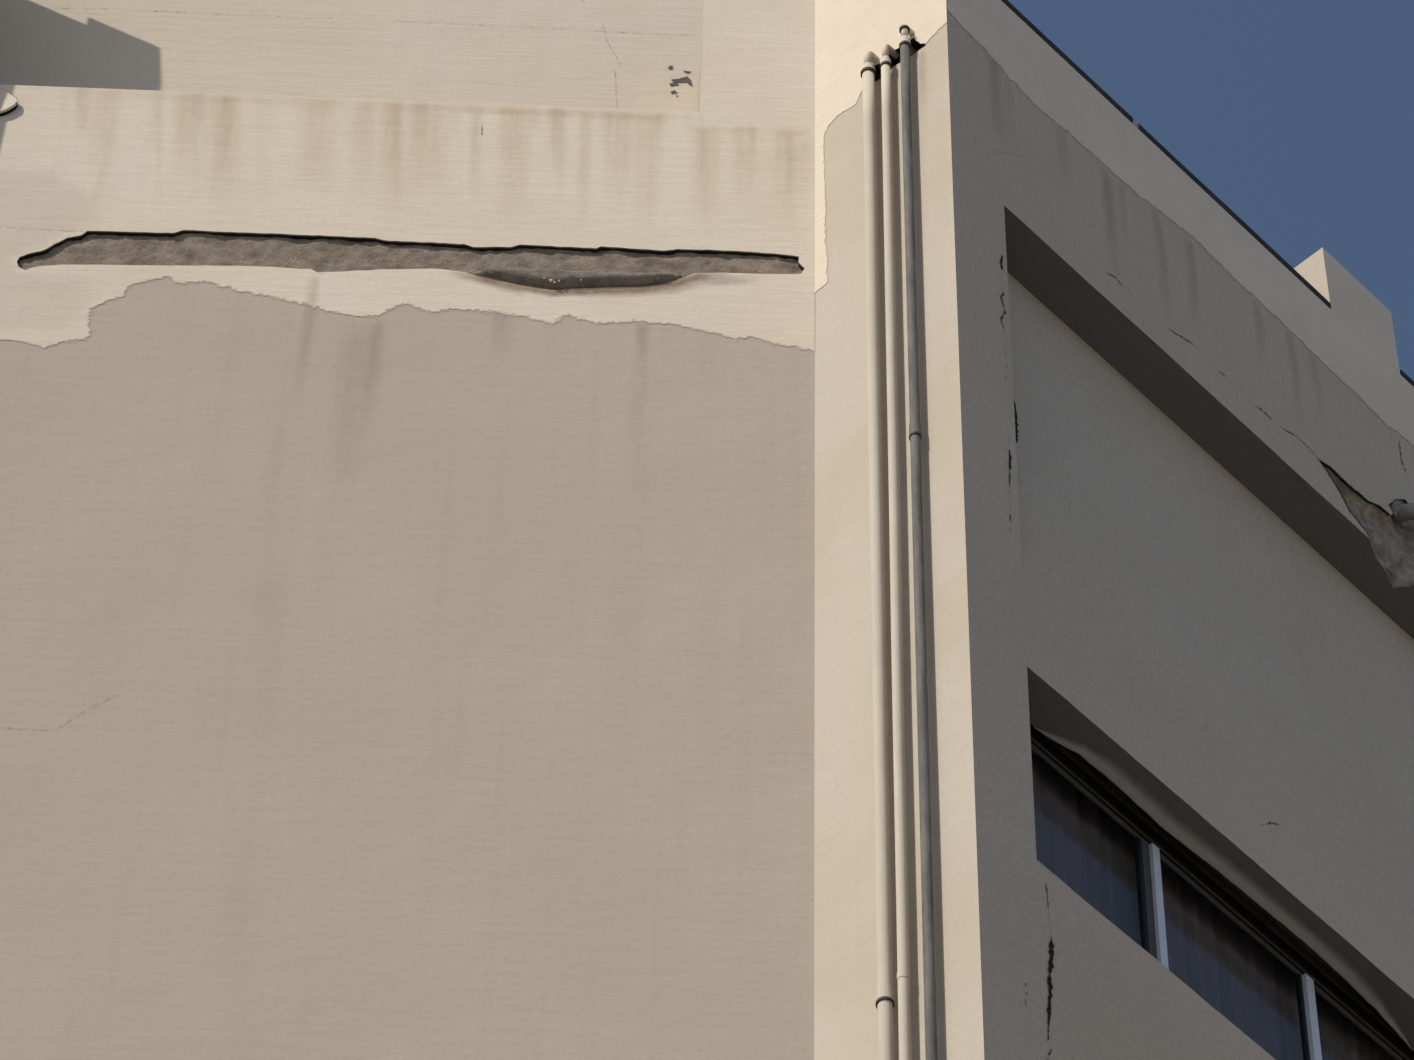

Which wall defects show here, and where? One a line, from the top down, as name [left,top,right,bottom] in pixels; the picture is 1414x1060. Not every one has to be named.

spalling [17,230,805,290]
crack [1000,255,1019,531]
spalling [1318,459,1414,590]
crack [1025,885,1055,1060]